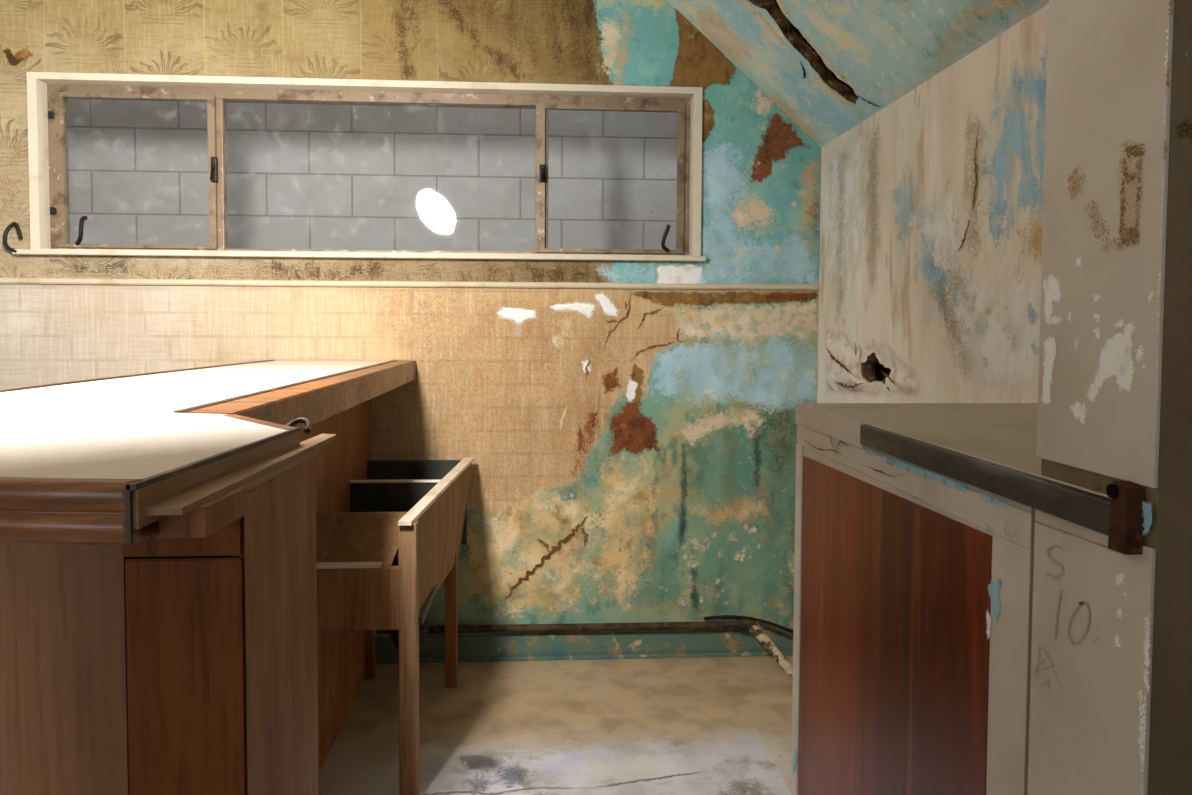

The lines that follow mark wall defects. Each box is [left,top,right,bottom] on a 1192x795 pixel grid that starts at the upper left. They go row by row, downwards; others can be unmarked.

crack [741,0,882,108]
corrosion [1066,139,1146,251]
peeling [428,0,894,635]
peeling [1069,293,1158,424]
crack [504,515,592,600]
leakage [419,725,791,795]